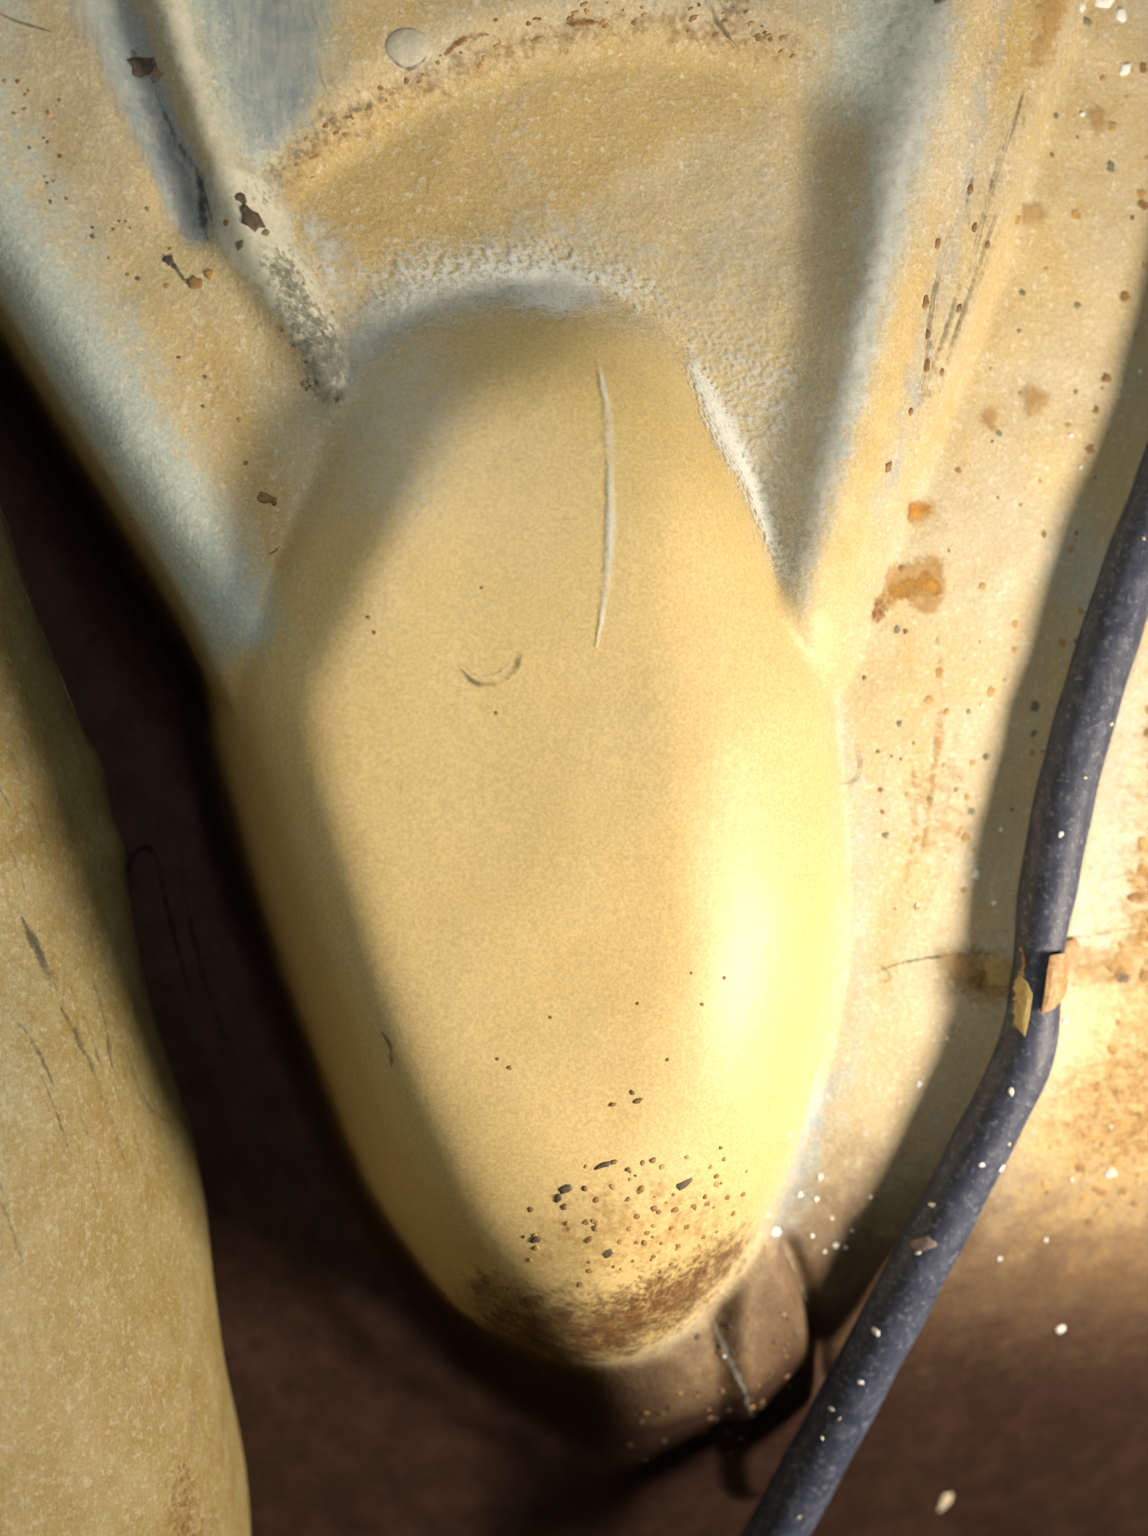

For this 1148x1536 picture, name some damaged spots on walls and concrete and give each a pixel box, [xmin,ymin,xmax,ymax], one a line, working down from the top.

corrosion [1130,189,1148,221]
mould [269,257,352,402]
corrosion [1092,373,1111,414]
corrosion [985,411,1002,443]
corrosion [909,501,932,523]
corrosion [873,549,950,635]
corrosion [924,667,971,715]
corrosion [954,787,976,851]
corrosion [1062,1015,1148,1225]
corrosion [465,1146,746,1363]